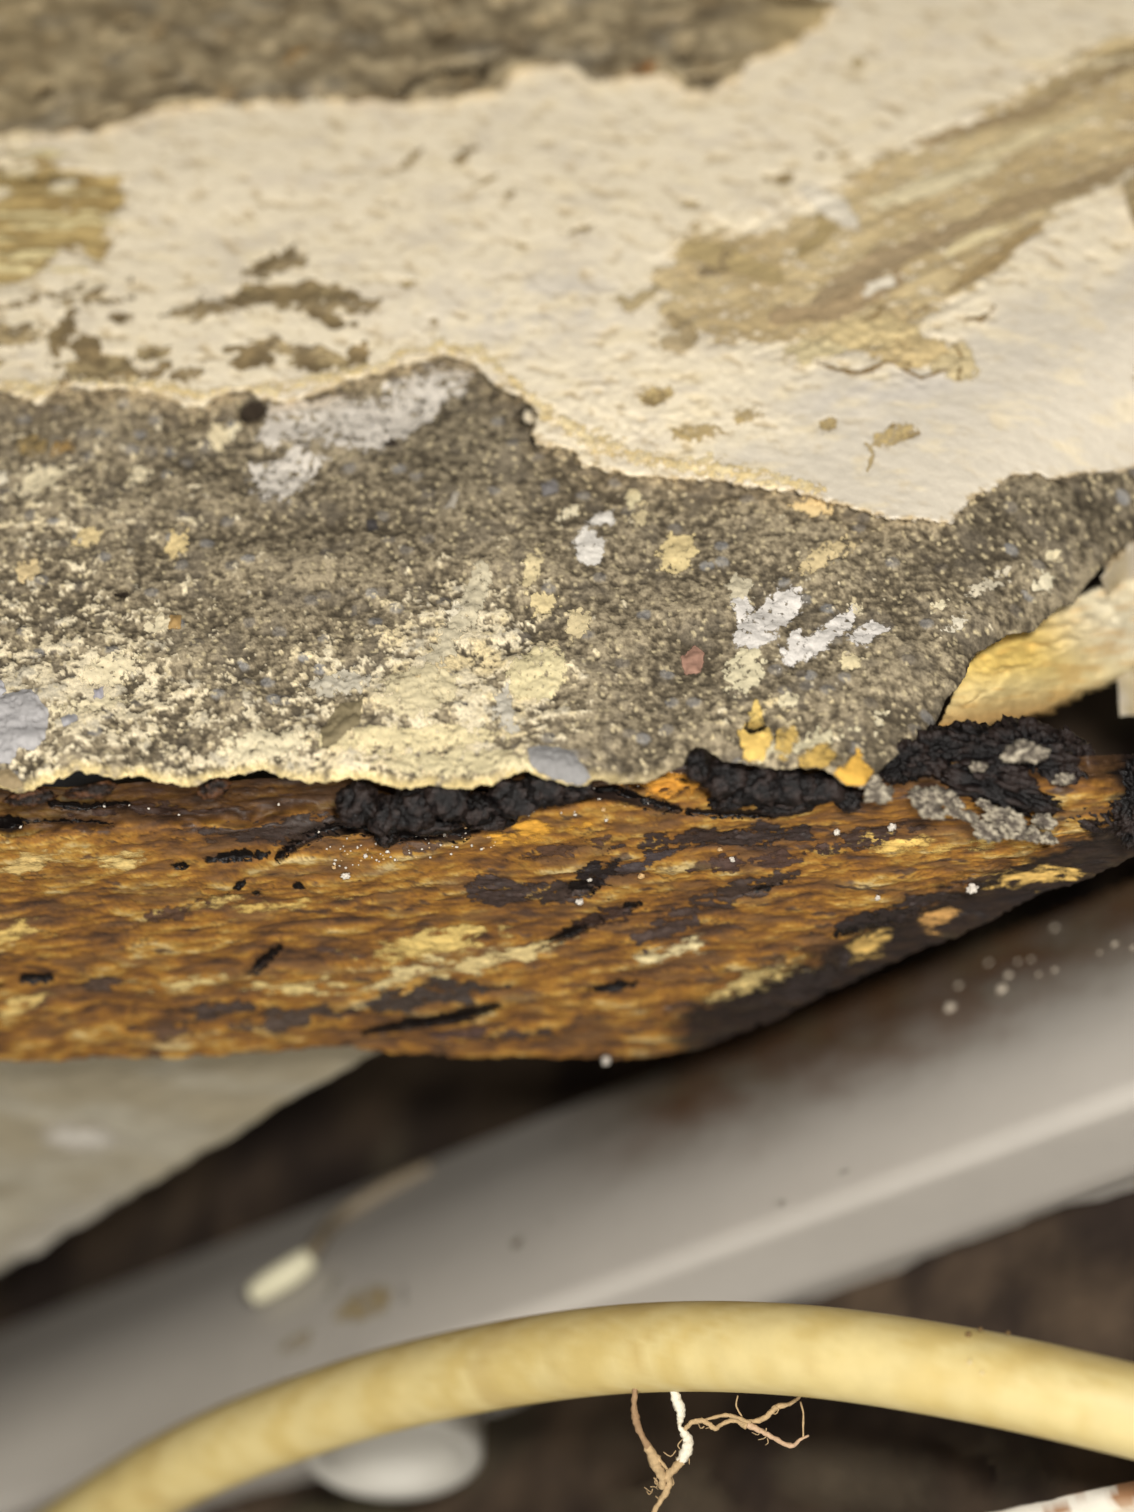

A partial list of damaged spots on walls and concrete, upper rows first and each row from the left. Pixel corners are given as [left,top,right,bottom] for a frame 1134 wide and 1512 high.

peeling [0,0,1134,836]
corrosion [2,780,118,807]
corrosion [196,777,232,800]
corrosion [334,772,598,848]
corrosion [685,700,1134,850]
corrosion [638,881,1134,1121]